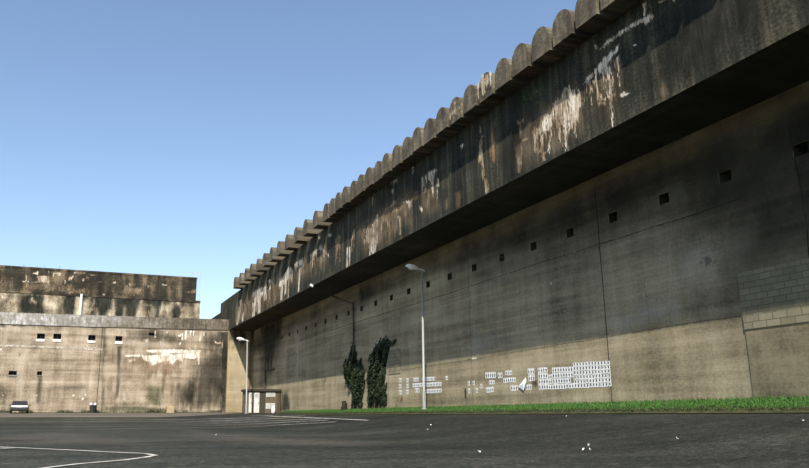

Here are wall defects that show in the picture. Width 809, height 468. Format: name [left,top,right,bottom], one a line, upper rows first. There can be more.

damp [658,0,760,76]
peeling [513,2,654,174]
damp [505,124,520,176]
damp [600,104,809,204]
peeling [421,169,440,198]
peeling [351,199,422,255]
damp [18,294,44,314]
damp [63,296,75,315]
damp [90,297,193,318]
peeling [237,234,341,324]
peeling [117,330,204,368]
damp [171,319,282,410]